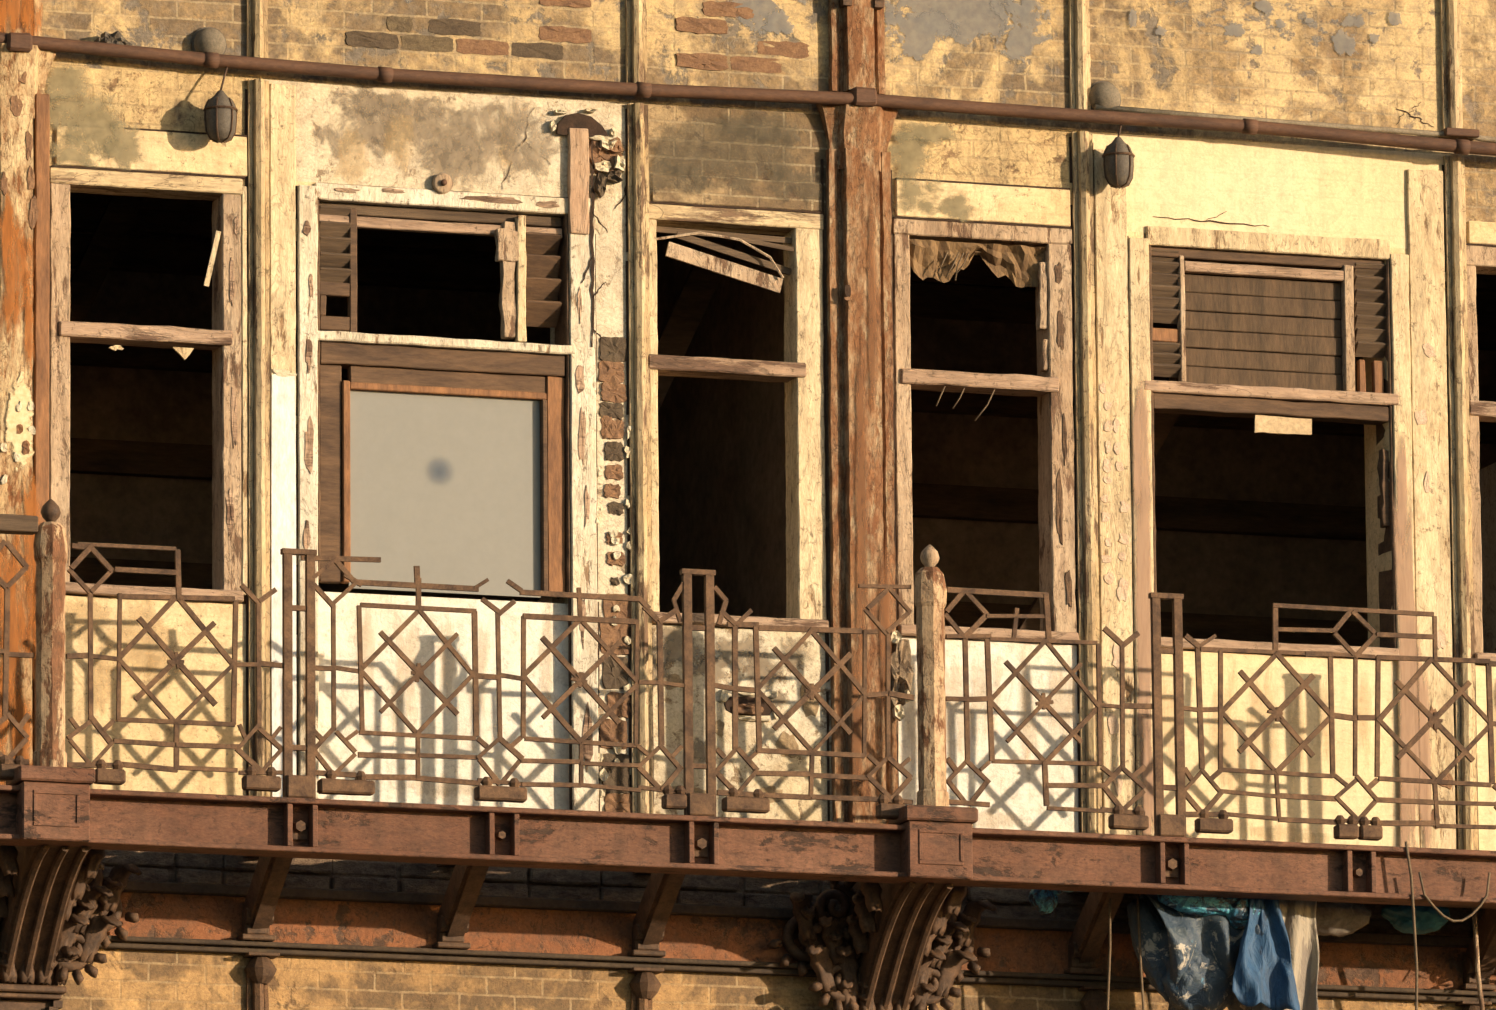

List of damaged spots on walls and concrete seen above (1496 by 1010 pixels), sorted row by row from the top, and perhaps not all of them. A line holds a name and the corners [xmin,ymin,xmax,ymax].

flaking render [675,0,809,73]
peeling [10,71,39,229]
crack [502,110,551,189]
spalling [0,369,36,484]
spalling [575,336,635,813]